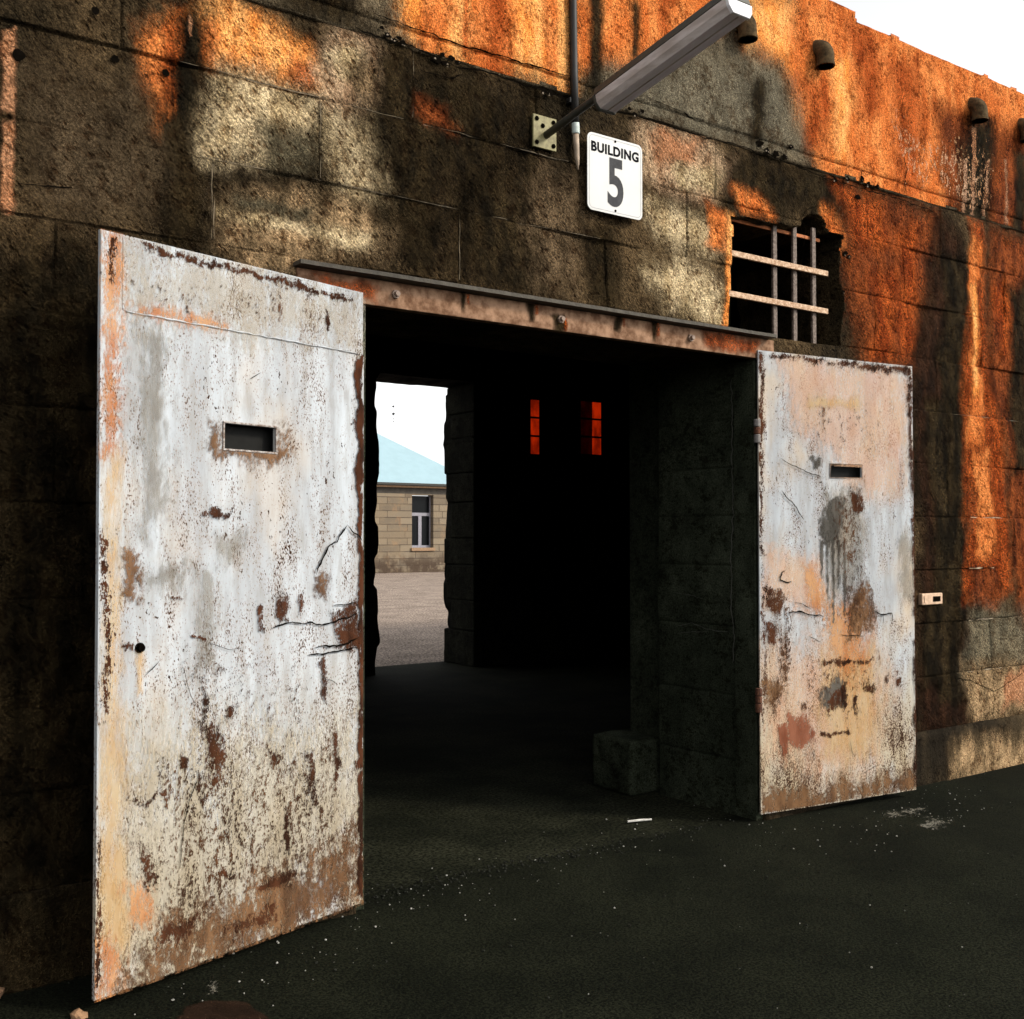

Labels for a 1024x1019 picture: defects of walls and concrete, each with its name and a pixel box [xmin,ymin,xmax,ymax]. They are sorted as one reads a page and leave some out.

corrosion [140,15,182,130]
corrosion [199,0,323,91]
corrosion [401,0,711,96]
leakage [956,118,1024,230]
corrosion [140,240,373,331]
corrosion [99,232,125,459]
corrosion [706,0,1024,756]
leakage [912,220,1024,731]
crack [316,526,362,575]
corrosion [95,354,364,1001]
crack [273,613,357,628]
corrosion [762,630,917,813]